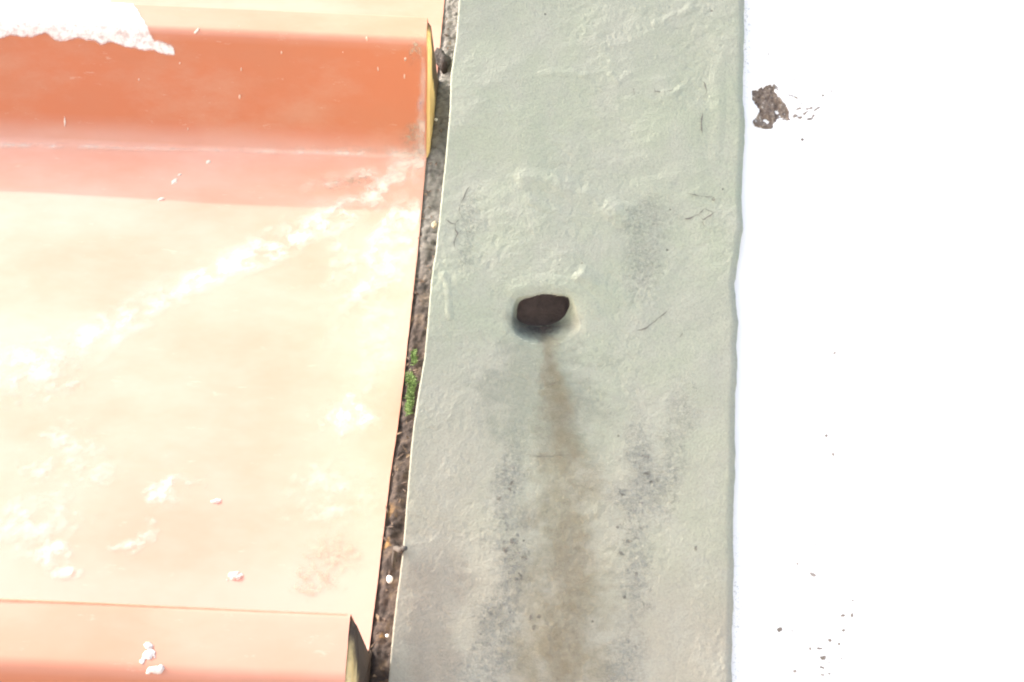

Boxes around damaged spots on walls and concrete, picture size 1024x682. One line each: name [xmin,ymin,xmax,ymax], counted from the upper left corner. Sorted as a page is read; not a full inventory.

leakage [520,324,557,335]